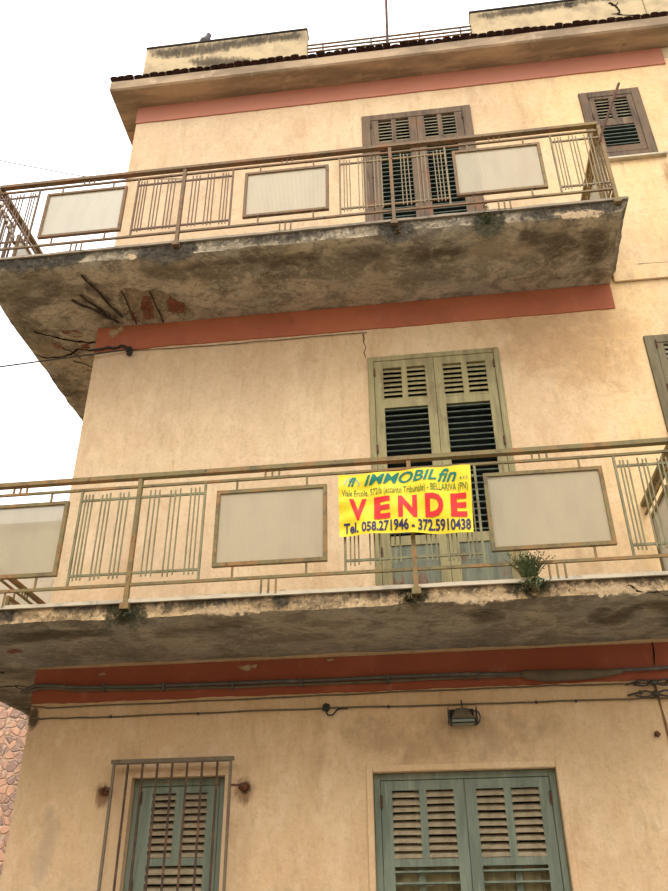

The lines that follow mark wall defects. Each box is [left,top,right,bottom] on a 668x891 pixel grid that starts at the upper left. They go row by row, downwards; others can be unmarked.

leakage [257,230,322,245]
leakage [0,255,85,273]
leakage [137,243,198,265]
crack [616,262,667,283]
spalling [71,275,194,337]
crack [34,331,96,367]
leakage [186,598,239,608]
leakage [273,590,289,608]
leakage [396,583,429,607]
leakage [505,582,551,598]
leakage [0,610,14,623]
leakage [18,598,147,637]